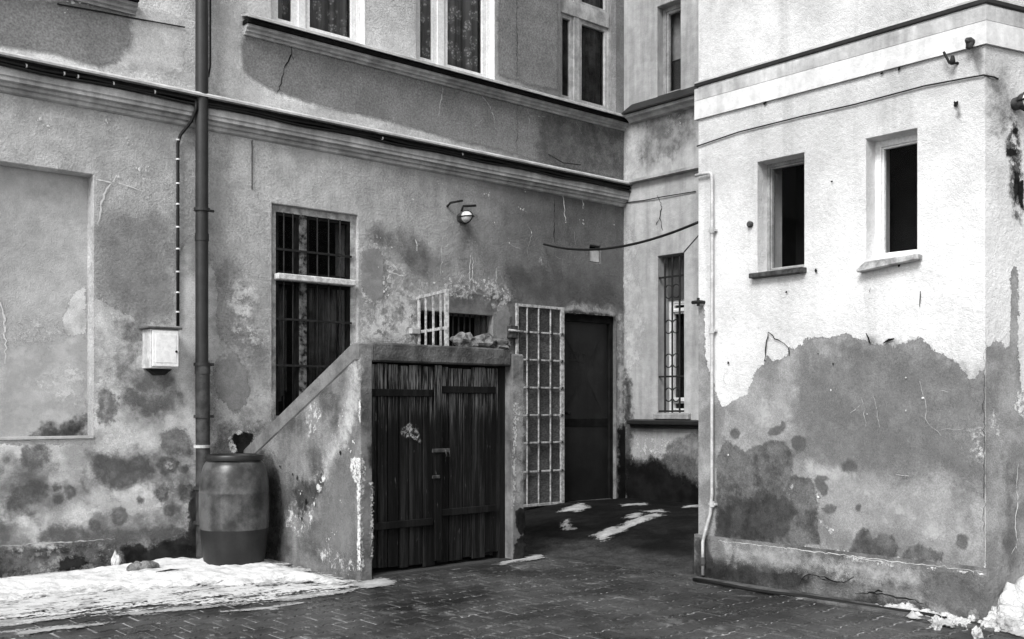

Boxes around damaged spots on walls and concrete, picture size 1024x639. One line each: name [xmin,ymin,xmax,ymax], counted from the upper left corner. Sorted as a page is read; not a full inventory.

flaking render [1006,120,1024,220]
peeling [0,236,196,578]
water stain [0,301,196,571]
peeling [208,251,275,454]
flaking render [339,440,374,571]
water stain [359,225,698,504]
water stain [693,339,1000,620]
peeling [698,266,1024,575]